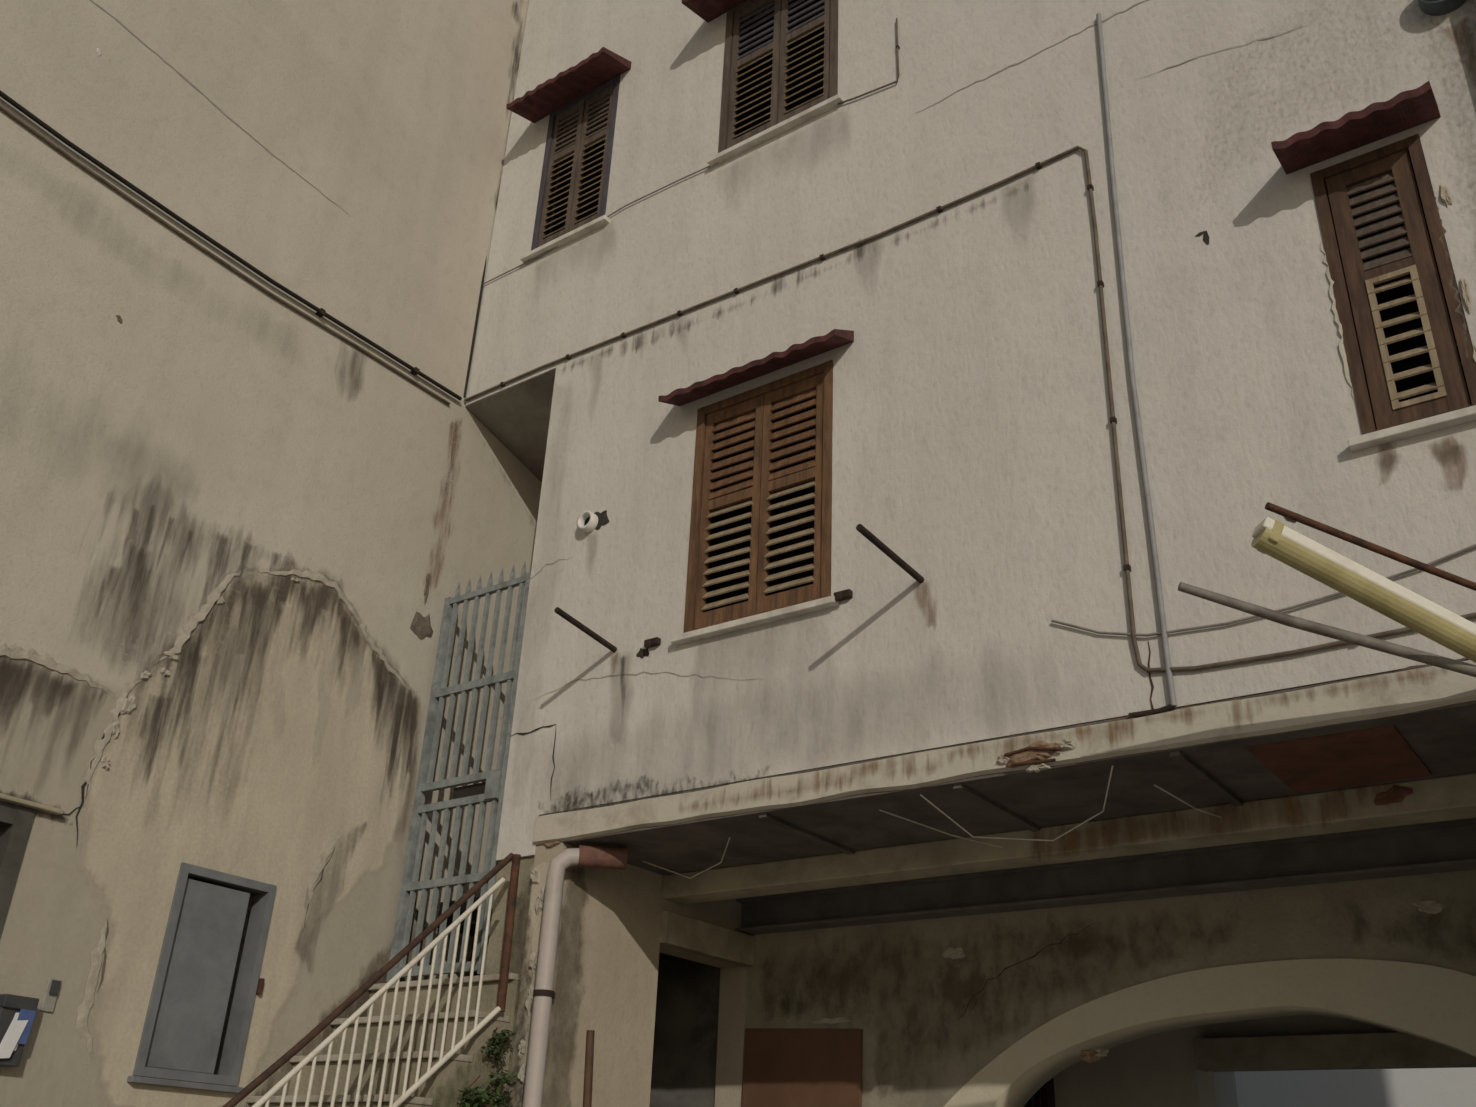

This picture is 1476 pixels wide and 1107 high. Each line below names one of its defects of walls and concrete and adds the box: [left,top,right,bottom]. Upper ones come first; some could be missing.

leakage [127,487,168,643]
leakage [229,570,359,678]
leakage [0,658,86,718]
crack [61,694,129,844]
leakage [147,614,219,766]
leakage [372,652,417,785]
spalling [997,739,1076,773]
spalling [1374,785,1413,805]
crack [302,848,335,933]
crack [97,919,109,993]